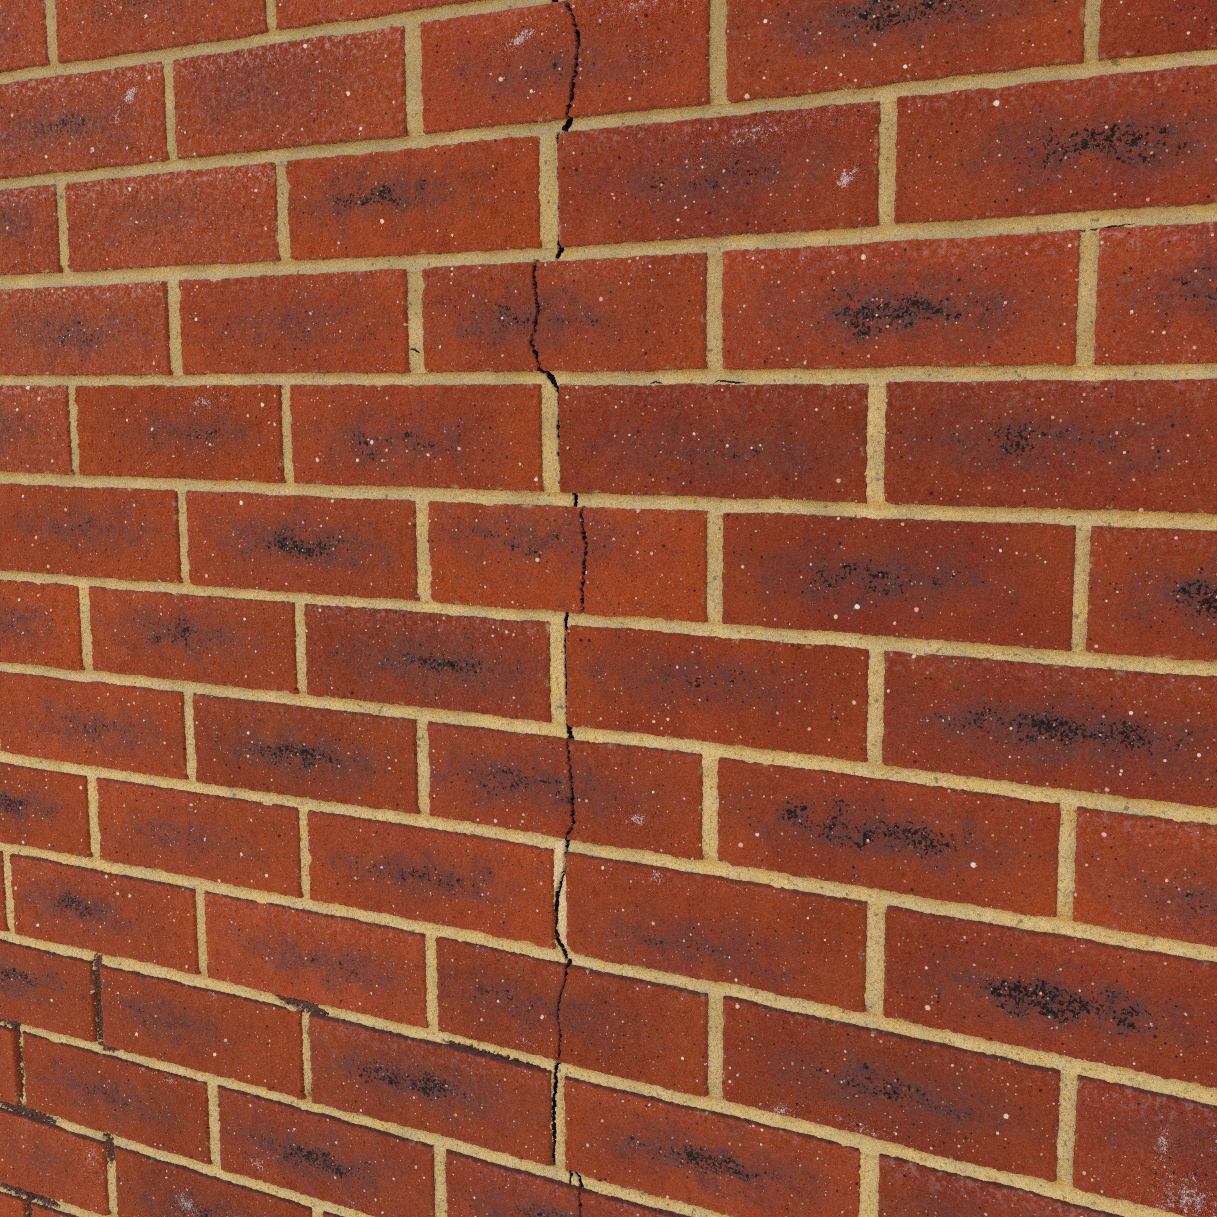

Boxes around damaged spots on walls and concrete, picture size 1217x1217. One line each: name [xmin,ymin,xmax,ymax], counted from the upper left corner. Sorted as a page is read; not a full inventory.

crack [552,0,581,143]
crack [529,208,588,1209]